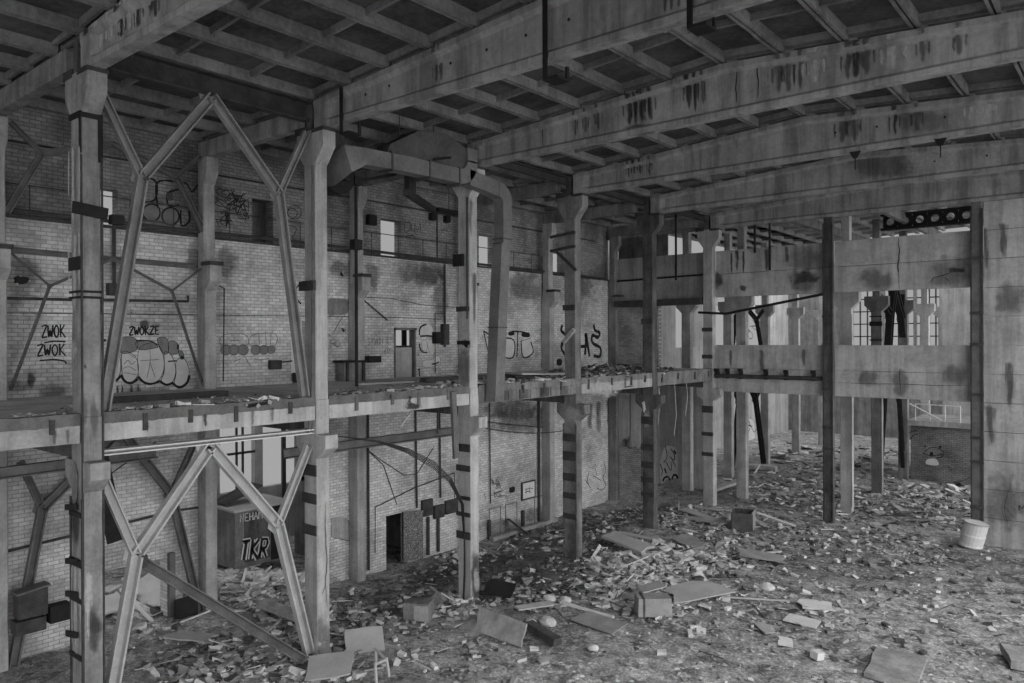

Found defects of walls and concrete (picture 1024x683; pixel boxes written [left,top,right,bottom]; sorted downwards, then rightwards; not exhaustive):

water stain [623,87,656,133]
water stain [683,70,706,110]
water stain [772,47,825,90]
water stain [841,31,930,77]